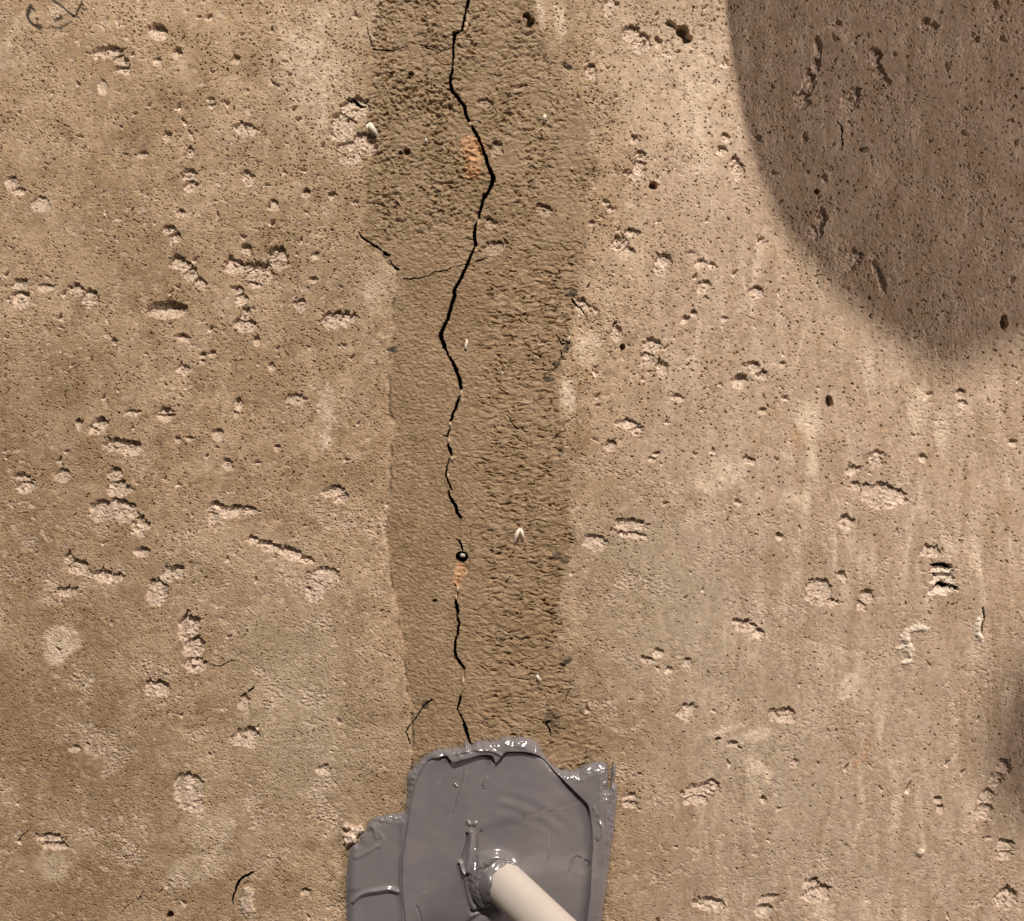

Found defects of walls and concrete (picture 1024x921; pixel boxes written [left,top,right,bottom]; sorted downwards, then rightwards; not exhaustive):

rust [458,134,488,181]
crack [358,0,496,745]
rust [452,561,469,593]